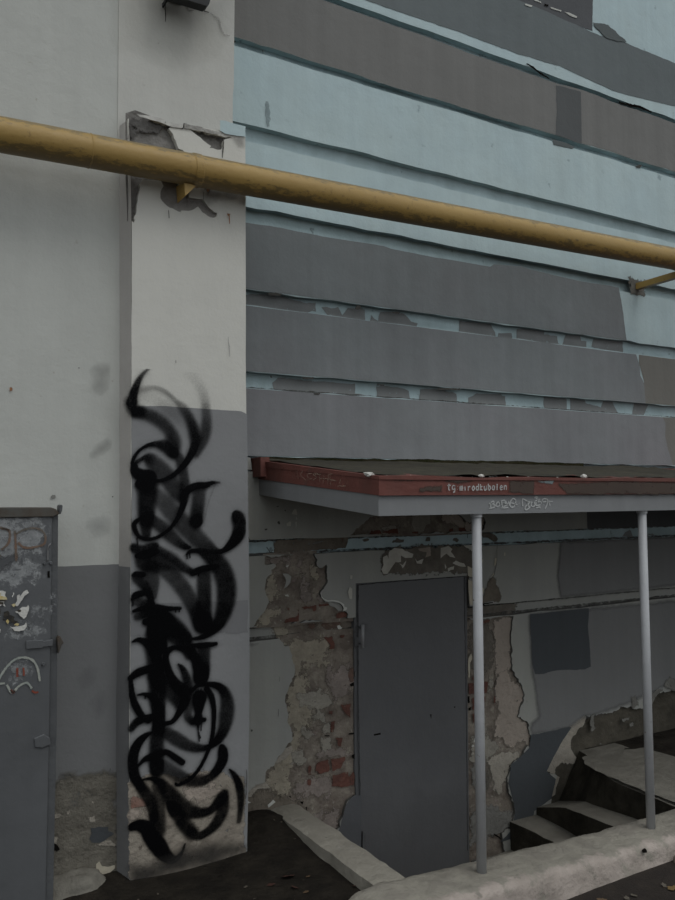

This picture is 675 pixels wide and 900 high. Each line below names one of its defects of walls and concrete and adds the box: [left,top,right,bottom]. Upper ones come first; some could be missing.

spalling [125,110,225,150]
spalling [126,175,216,221]
spalling [54,514,530,880]
spalling [547,677,675,803]